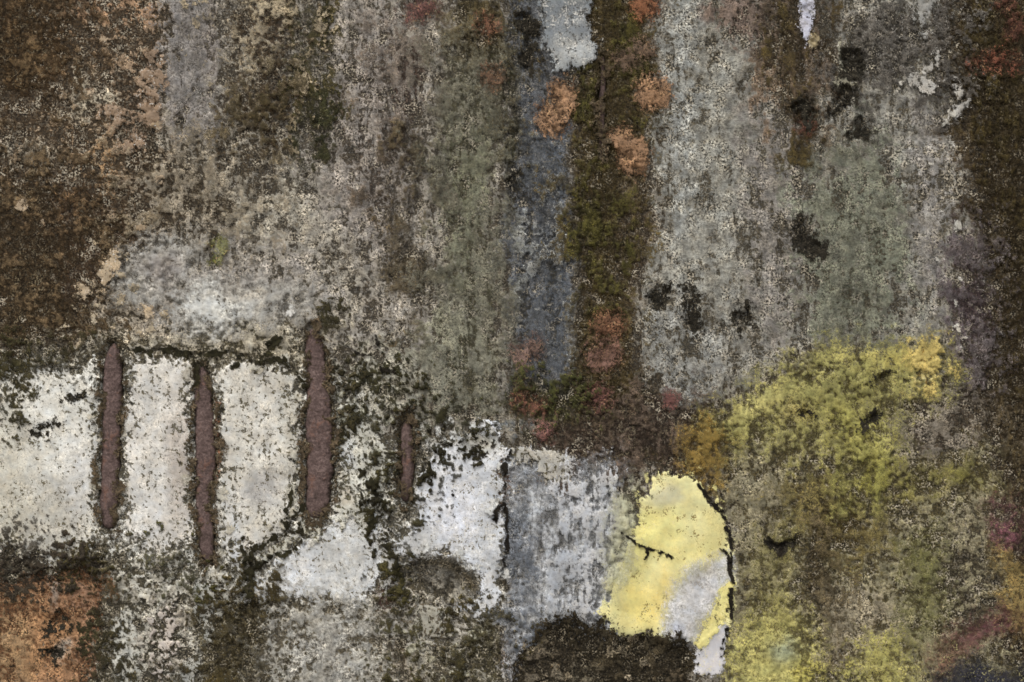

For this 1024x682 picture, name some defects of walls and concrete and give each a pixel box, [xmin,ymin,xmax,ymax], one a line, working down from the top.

peeling [71,248,170,337]
corrosion [305,329,335,519]
peeling [0,316,739,682]
corrosion [399,420,415,502]
crack [412,441,512,601]
crack [621,532,674,560]
crack [697,483,739,657]